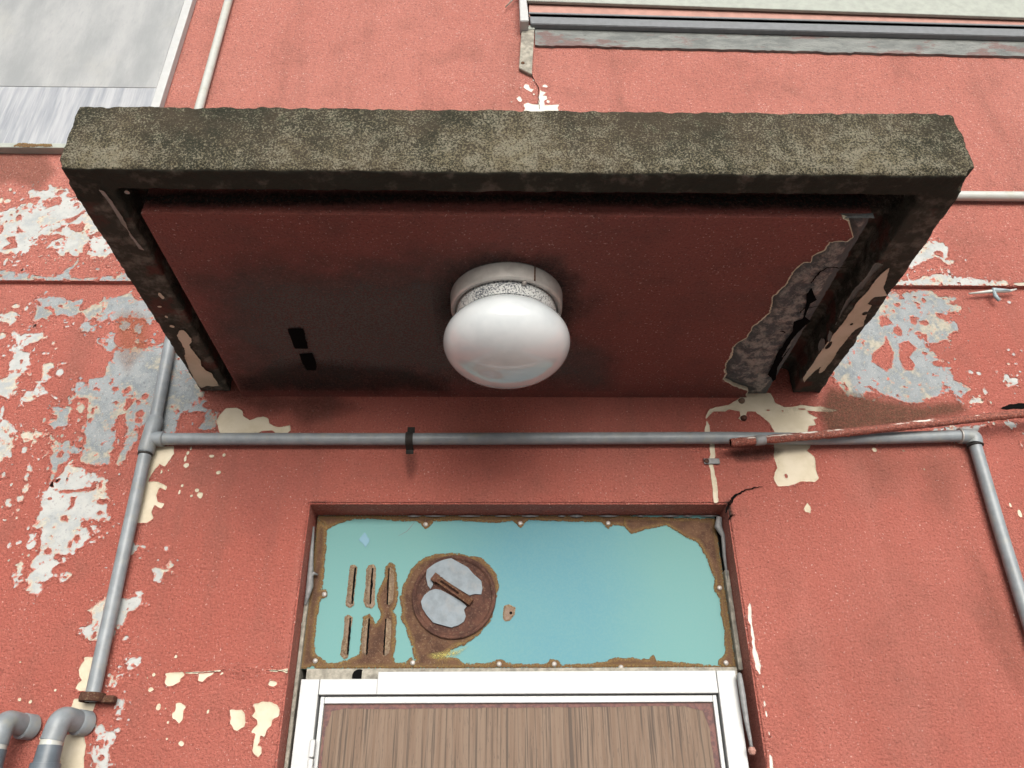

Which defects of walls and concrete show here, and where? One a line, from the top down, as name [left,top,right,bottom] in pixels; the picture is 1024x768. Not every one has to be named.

peeling [509,80,560,111]
peeling [0,181,293,605]
spalling [704,213,874,489]
peeling [803,236,1024,449]
crack [705,421,763,520]
peeling [60,543,217,768]
peeling [227,678,282,760]
corrosion [301,515,736,669]
peeling [746,601,772,739]
peeling [766,752,776,768]